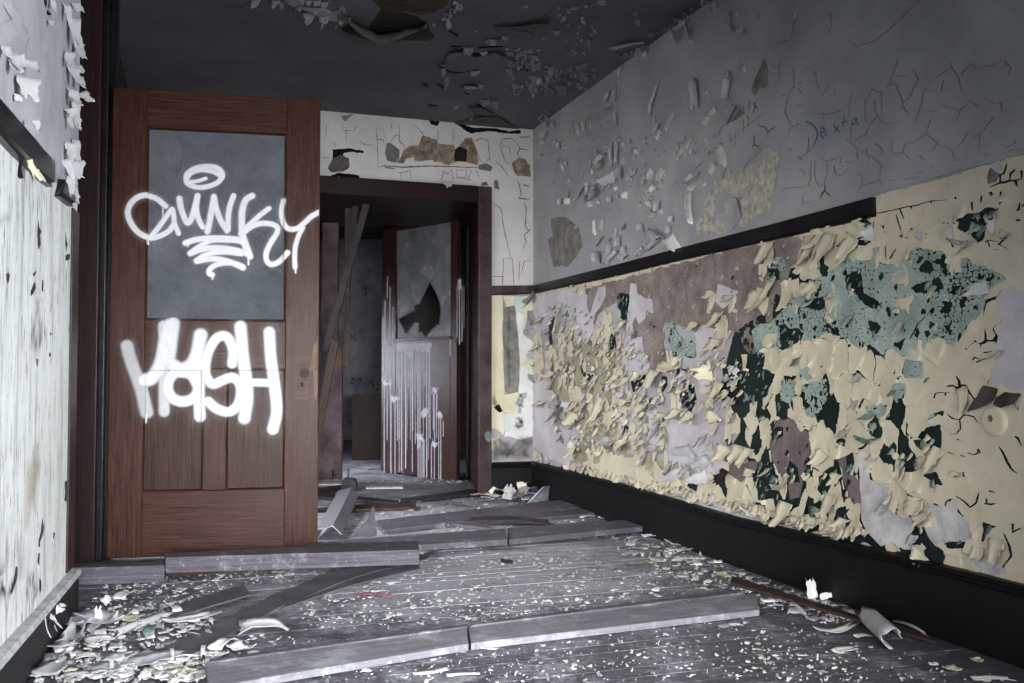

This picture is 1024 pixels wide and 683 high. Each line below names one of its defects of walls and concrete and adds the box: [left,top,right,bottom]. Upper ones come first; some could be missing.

peeling [0,44,43,102]
peeling [61,2,95,204]
spalling [328,148,364,178]
spalling [250,0,463,45]
crack [322,30,530,284]
flaking render [385,135,499,189]
peeling [438,0,606,109]
crack [729,18,1023,247]
peeling [485,0,1024,584]
crack [933,351,1022,474]
crack [944,490,995,508]